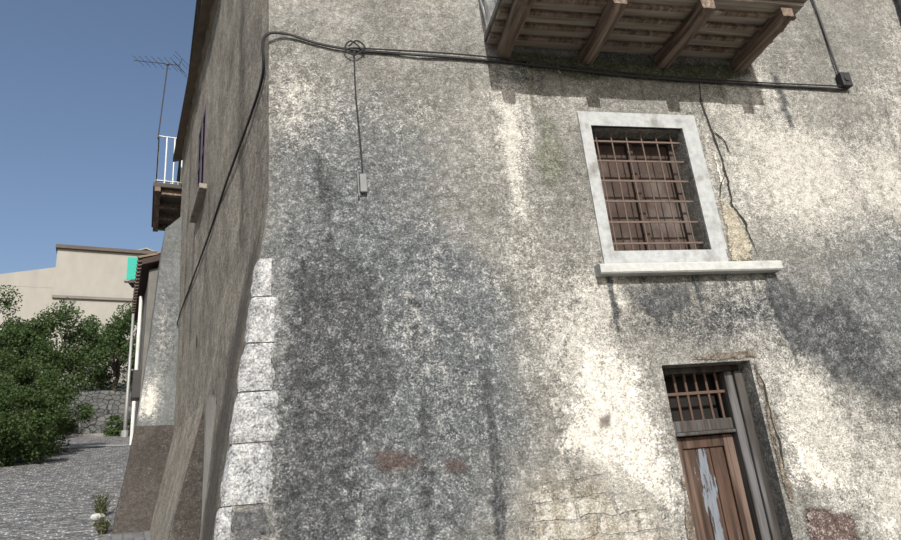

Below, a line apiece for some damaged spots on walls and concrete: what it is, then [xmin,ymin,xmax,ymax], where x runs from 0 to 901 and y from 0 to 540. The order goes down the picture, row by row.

leakage [315,156,331,224]
crack [696,77,757,252]
flaking render [717,196,754,261]
leakage [278,262,395,540]
leakage [420,406,433,530]
leakage [482,367,507,540]
flaking render [519,462,675,540]
flaking render [681,475,696,540]
peeling [689,349,860,540]